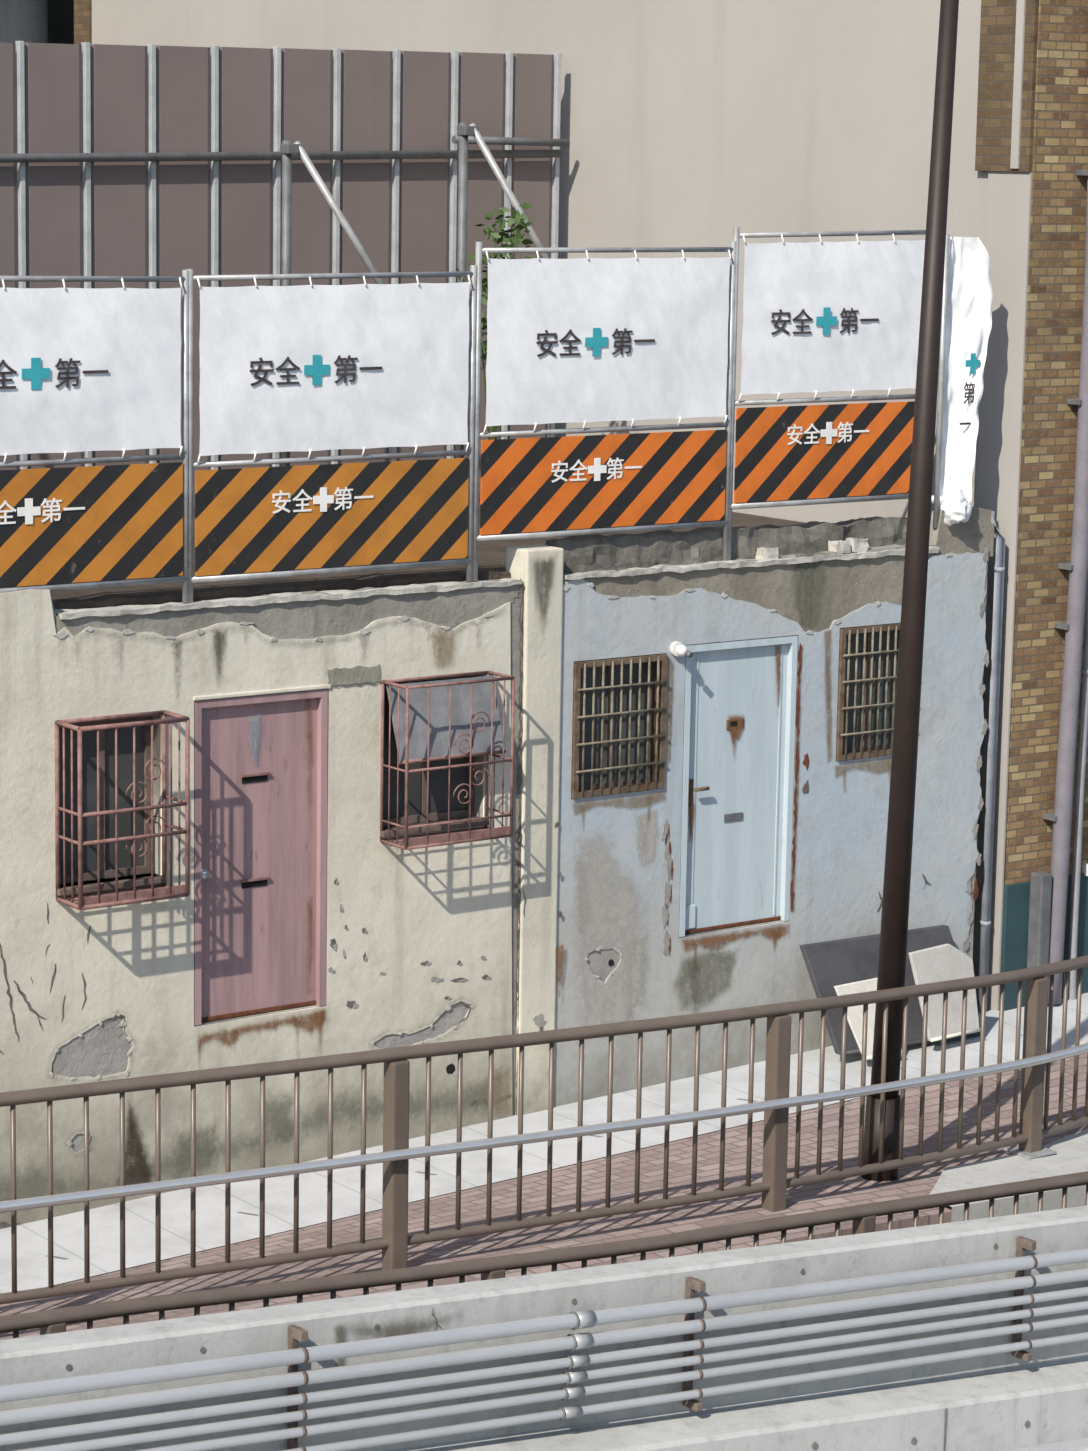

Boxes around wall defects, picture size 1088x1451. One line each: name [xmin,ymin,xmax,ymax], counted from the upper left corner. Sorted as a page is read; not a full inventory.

spalling [54,584,522,642]
spalling [563,555,905,634]
spalling [928,510,994,622]
corrosion [684,643,802,951]
crack [0,903,91,1055]
spalling [49,1013,132,1080]
corrosion [199,1011,325,1048]
spalling [371,956,491,1049]
spalling [585,948,623,983]